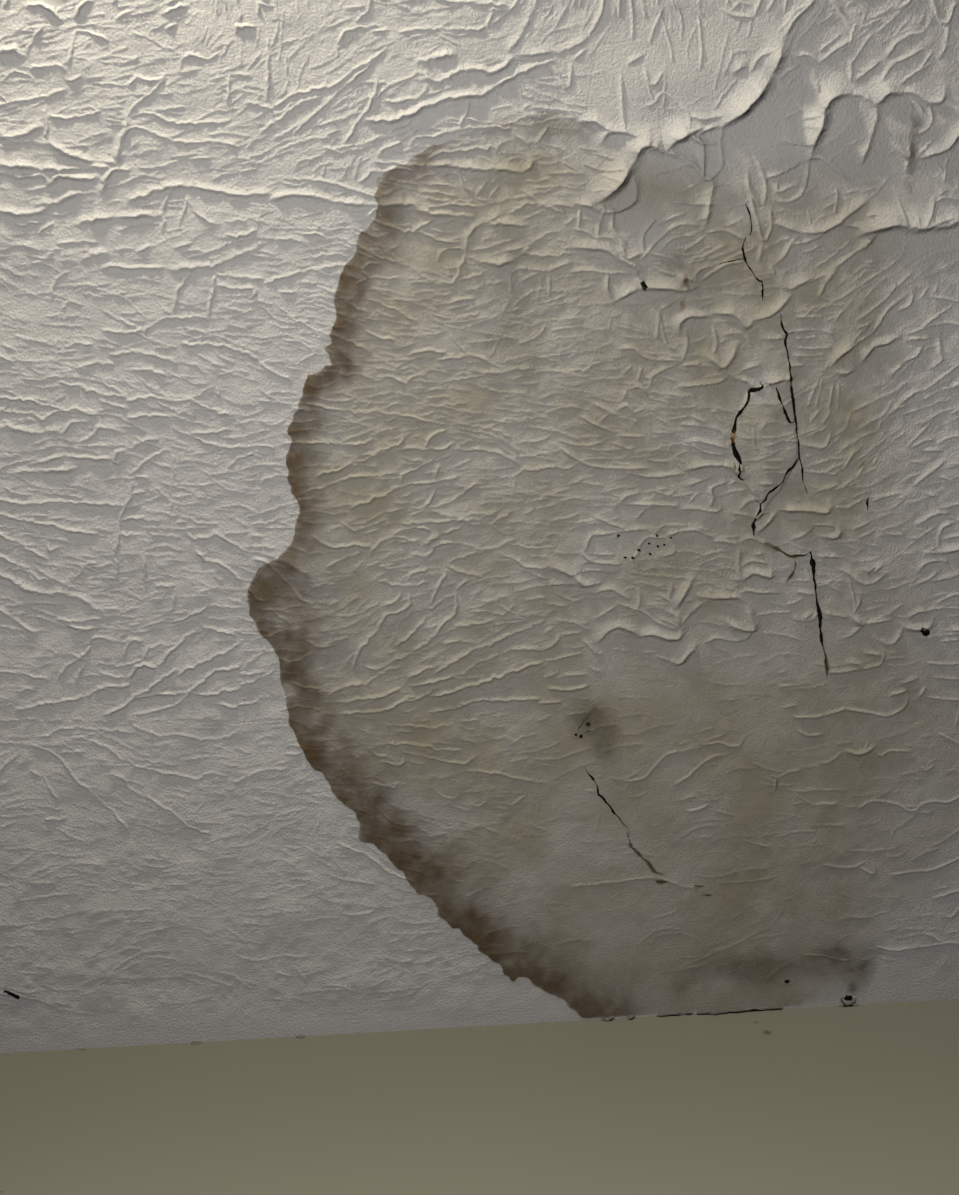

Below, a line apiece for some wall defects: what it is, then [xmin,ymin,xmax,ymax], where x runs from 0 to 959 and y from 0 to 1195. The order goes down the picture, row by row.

leakage [286,253,363,529]
crack [720,205,829,676]
leakage [248,554,603,1017]
crack [585,767,711,896]